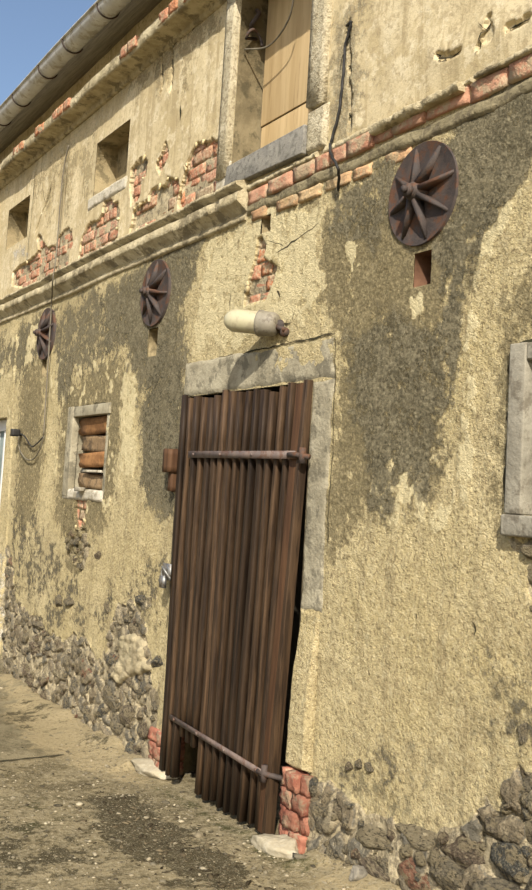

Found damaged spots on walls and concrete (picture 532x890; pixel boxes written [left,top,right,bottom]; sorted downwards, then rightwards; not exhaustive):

flaking render [133,139,218,228]
flaking render [15,200,120,287]
flaking render [244,240,277,304]